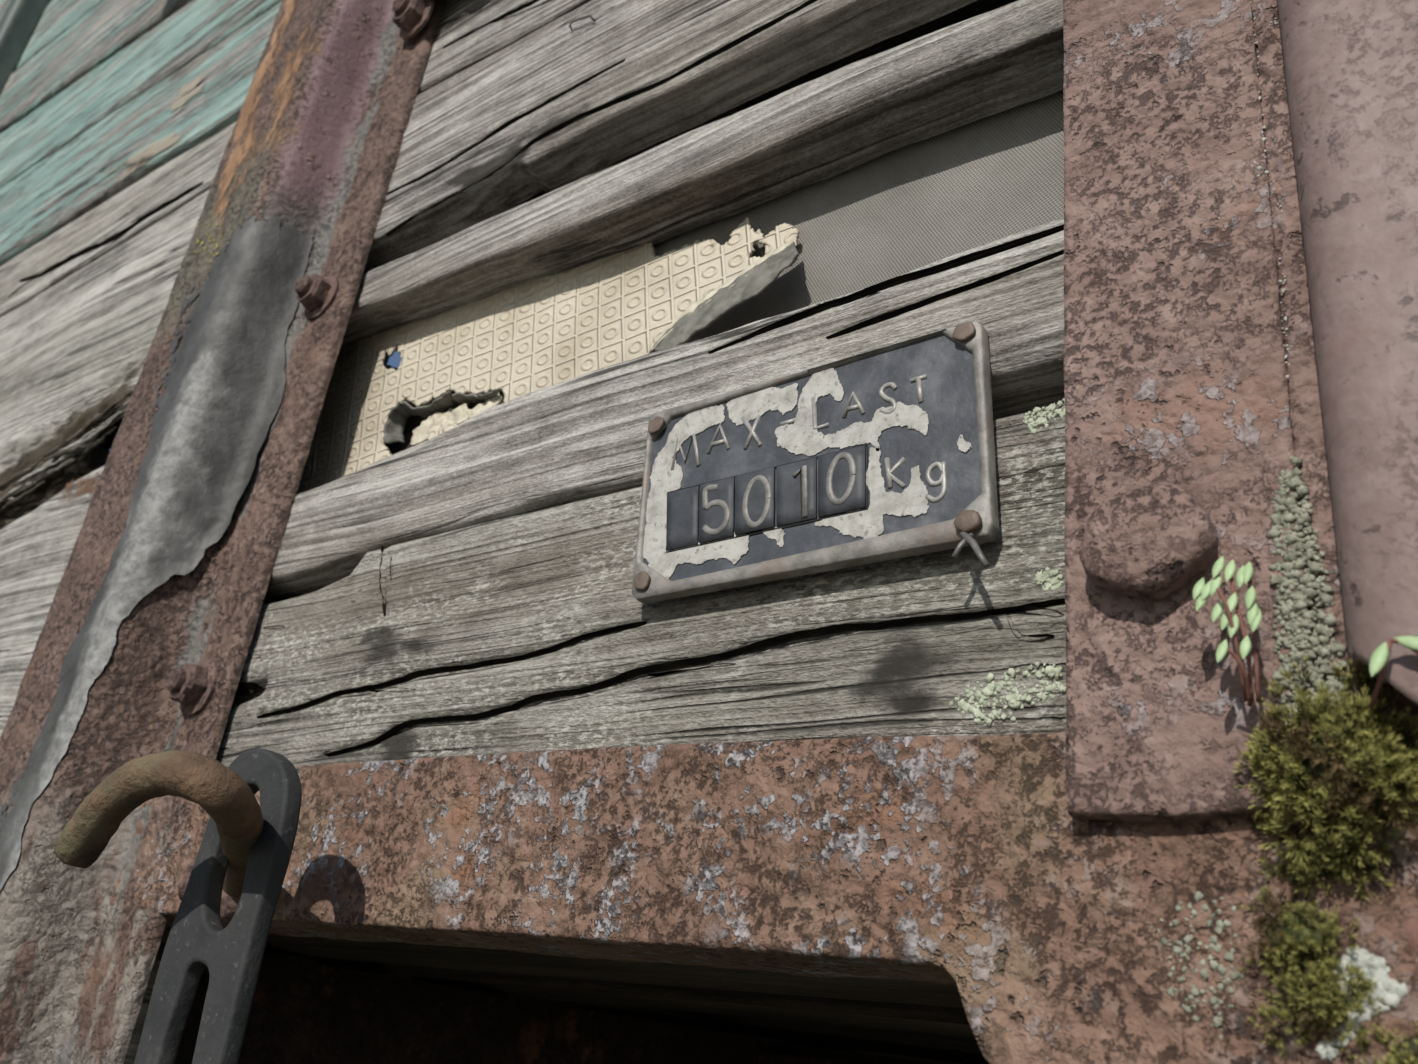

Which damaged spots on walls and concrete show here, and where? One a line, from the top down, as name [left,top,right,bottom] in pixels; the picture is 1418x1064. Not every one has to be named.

peeling [107,75,205,182]
rust [212,0,321,226]
crack [385,0,818,236]
peeling [649,237,799,352]
peeling [0,206,314,890]
crack [379,546,392,616]
crack [232,598,1065,757]